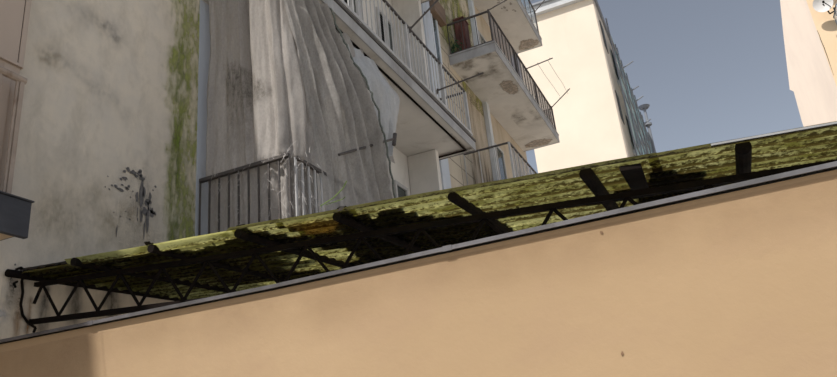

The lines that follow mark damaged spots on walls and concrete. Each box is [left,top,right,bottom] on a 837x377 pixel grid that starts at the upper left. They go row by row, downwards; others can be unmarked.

spalling [519,39,539,50]
spalling [499,80,518,94]
spalling [525,139,552,147]
water stain [170,122,182,198]
peeling [105,167,157,239]